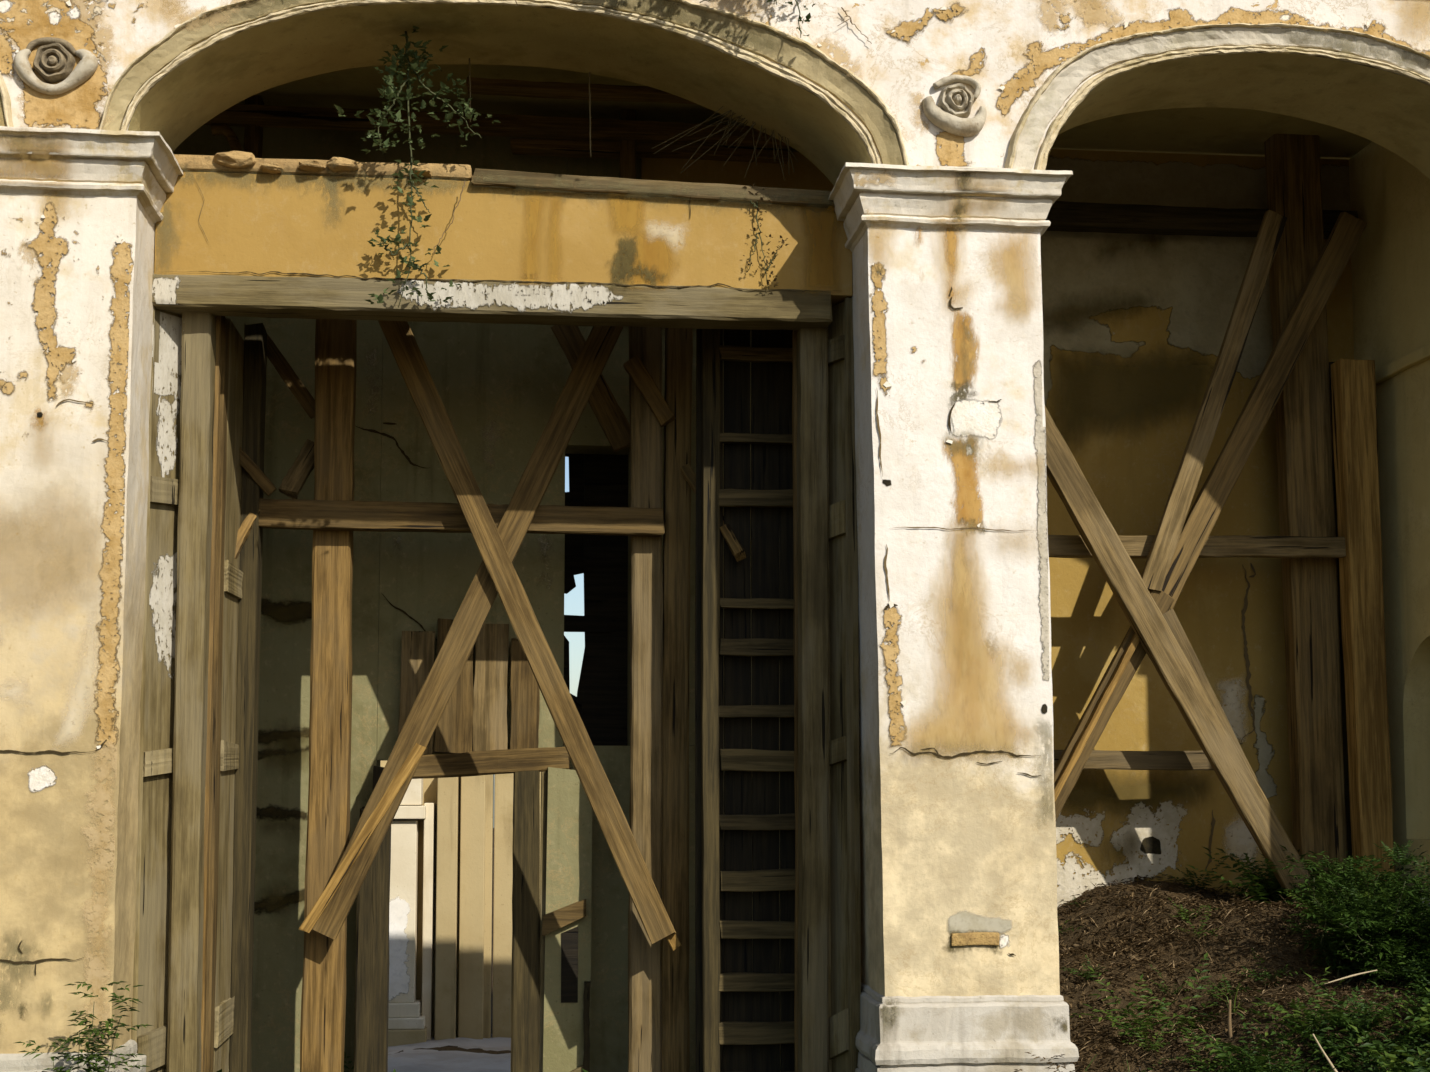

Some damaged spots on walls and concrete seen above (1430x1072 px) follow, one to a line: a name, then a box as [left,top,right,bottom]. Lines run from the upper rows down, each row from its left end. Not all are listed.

flaking render [0,0,116,129]
flaking render [996,0,1430,116]
flaking render [0,191,82,428]
peeling [396,278,623,313]
peeling [152,276,184,477]
flaking render [945,384,1003,532]
flaking render [59,236,134,1056]
peeling [149,552,177,679]
crack [0,739,107,754]
crack [890,747,1041,777]
flaking render [1056,800,1188,908]
crack [0,941,84,975]